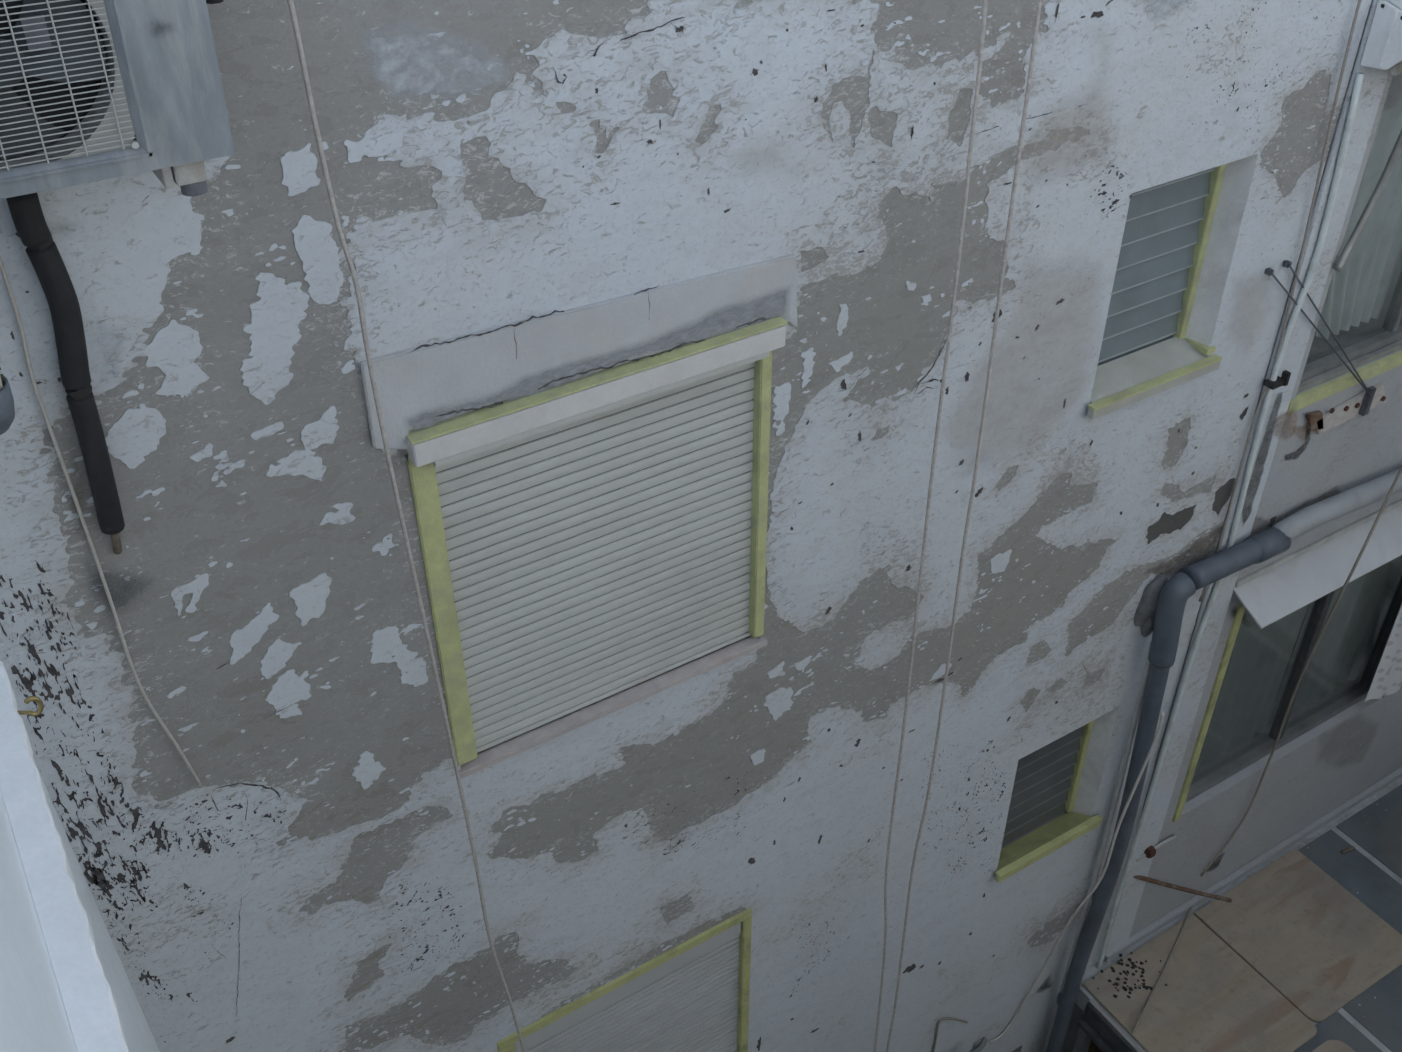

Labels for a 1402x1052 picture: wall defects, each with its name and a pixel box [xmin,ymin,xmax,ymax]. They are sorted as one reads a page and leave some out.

peeling [641,68,679,144]
peeling [814,0,1059,148]
peeling [1260,70,1341,198]
peeling [1090,165,1132,214]
crack [410,310,564,359]
crack [538,340,705,390]
crack [634,286,658,320]
crack [736,317,771,328]
peeling [767,126,1089,530]
crack [434,401,503,418]
peeling [0,0,651,1052]
peeling [488,417,1235,873]